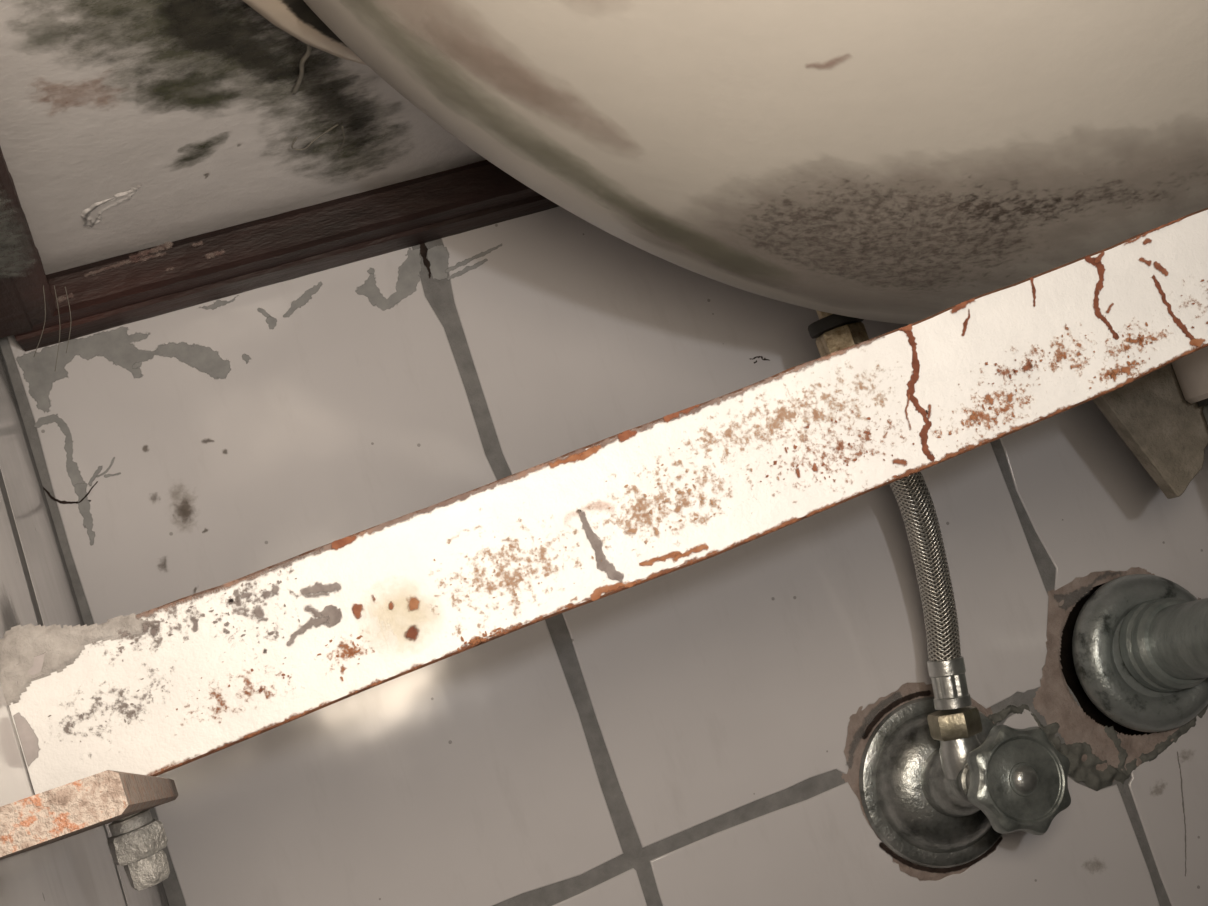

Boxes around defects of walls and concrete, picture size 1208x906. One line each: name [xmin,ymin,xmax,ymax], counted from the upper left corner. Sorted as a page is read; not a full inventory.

damp [37,0,398,175]
crack [1085,251,1119,340]
crack [1139,257,1195,340]
crack [898,324,935,461]
rust [136,279,1208,676]
peeling [93,570,342,661]
peeling [48,664,170,742]
rust [176,663,291,725]
rust [147,702,329,776]
rust [317,635,384,694]
spalling [841,682,1003,881]
spalling [971,567,1208,791]